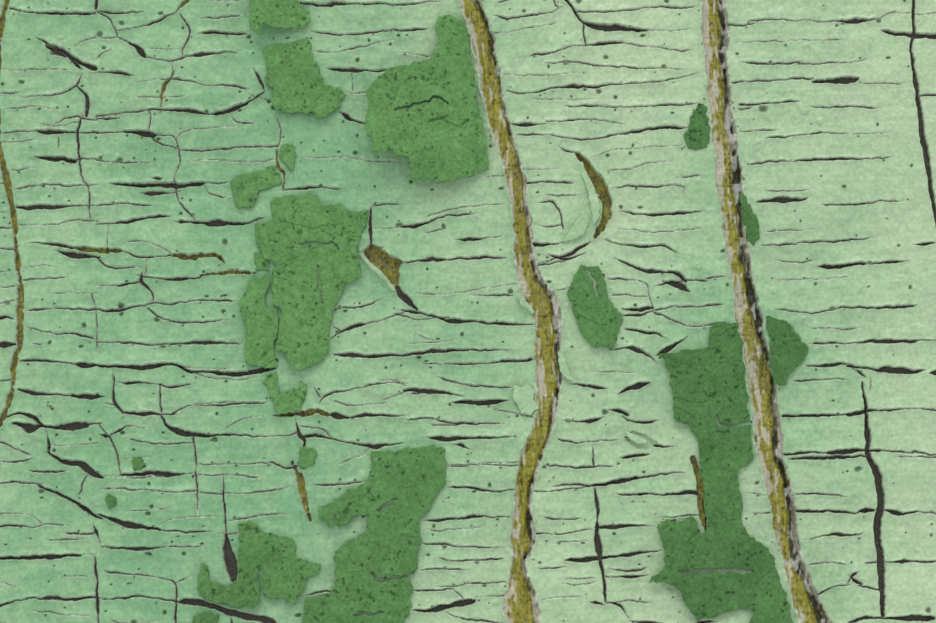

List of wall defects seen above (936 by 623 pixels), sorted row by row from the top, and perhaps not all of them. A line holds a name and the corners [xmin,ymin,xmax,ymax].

peeling [249,0,346,119]
peeling [365,15,489,183]
peeling [684,103,710,150]
crack [728,0,936,282]
peeling [230,143,403,415]
crack [0,0,731,623]
peeling [567,264,623,351]
peeling [766,316,809,386]
peeling [192,445,447,623]
peeling [649,322,794,623]
crack [741,490,772,516]
crack [773,303,936,623]